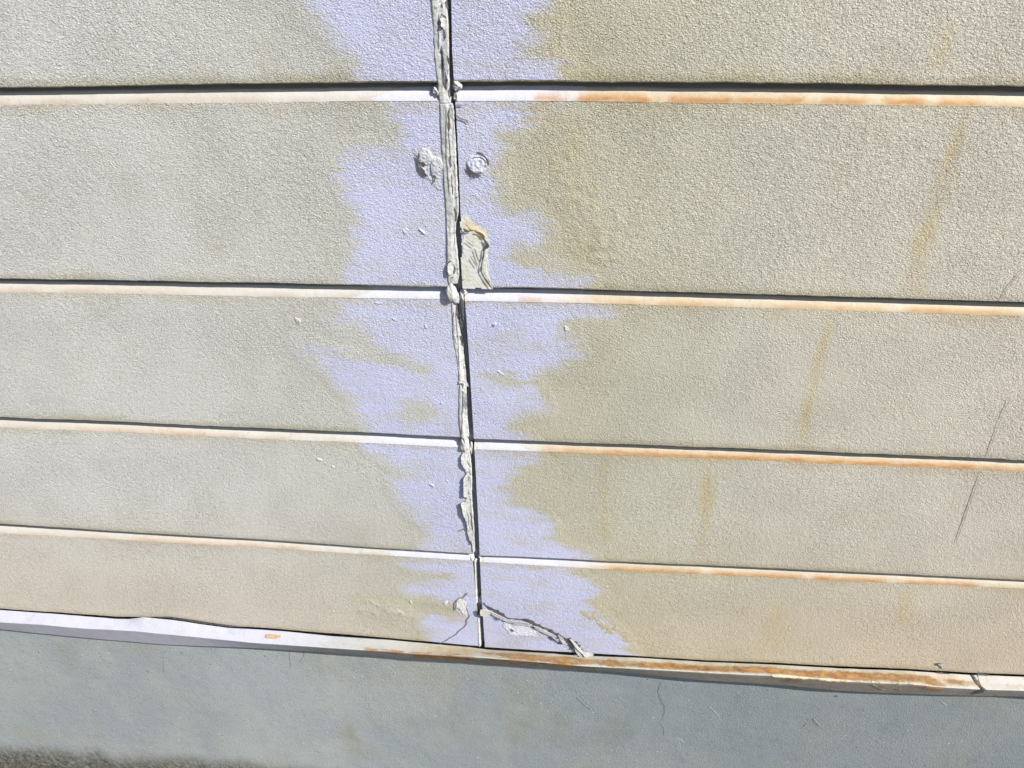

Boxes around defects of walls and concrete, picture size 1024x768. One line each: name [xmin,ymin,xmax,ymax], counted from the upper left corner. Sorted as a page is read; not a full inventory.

crack [438,0,489,220]
spalling [460,215,493,289]
crack [447,260,469,424]
corrosion [365,648,964,691]